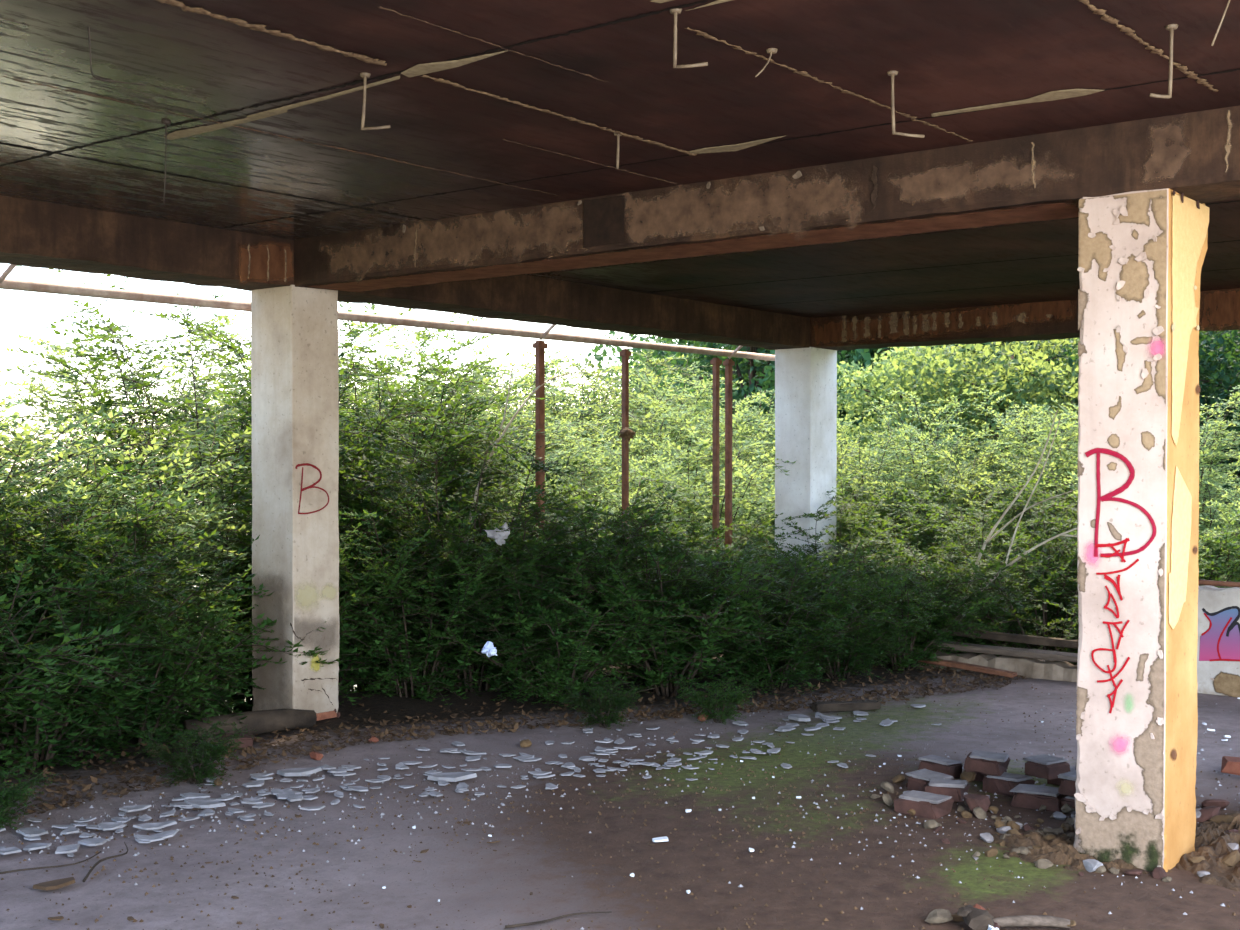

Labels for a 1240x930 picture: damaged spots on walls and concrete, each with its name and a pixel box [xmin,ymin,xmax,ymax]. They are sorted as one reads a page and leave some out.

crack [0,70,703,228]
peeling [64,0,862,282]
crack [446,0,709,61]
crack [755,105,1013,146]
crack [1100,69,1240,92]
peeling [888,118,1209,870]